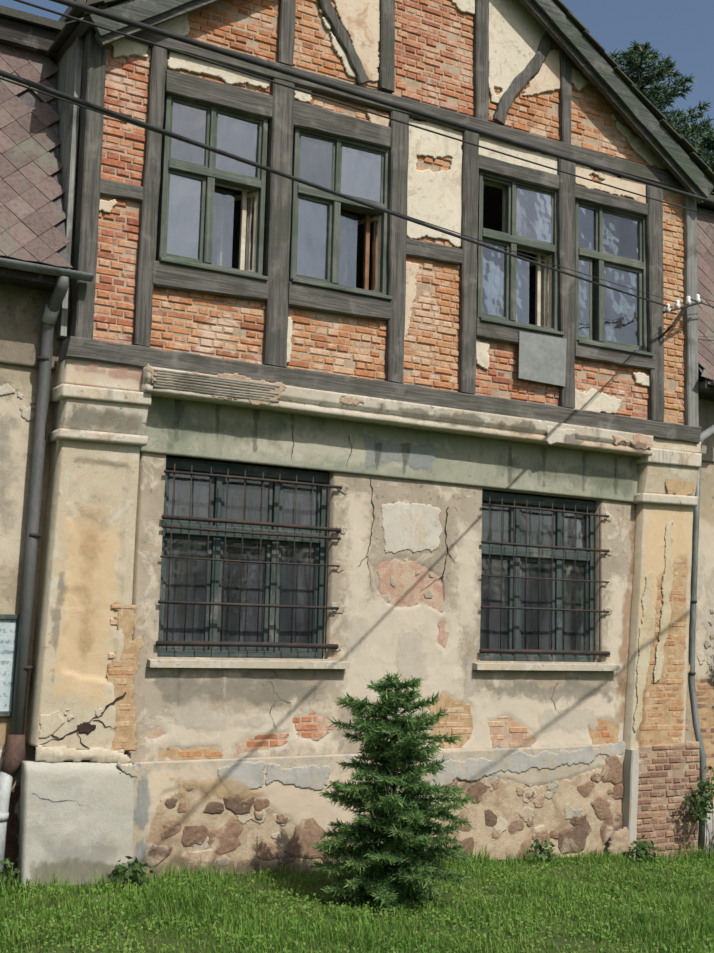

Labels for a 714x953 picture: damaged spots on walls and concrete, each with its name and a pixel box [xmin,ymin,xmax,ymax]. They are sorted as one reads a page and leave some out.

spalling [147,364,286,406]
crack [358,478,375,587]
crack [423,507,453,596]
spalling [376,558,450,648]
peeling [39,706,102,738]
crack [40,692,126,748]
spalling [106,600,223,778]
spalling [235,711,334,755]
spalling [425,693,473,749]
spalling [633,520,714,859]
spalling [144,782,353,877]
spalling [431,715,624,861]